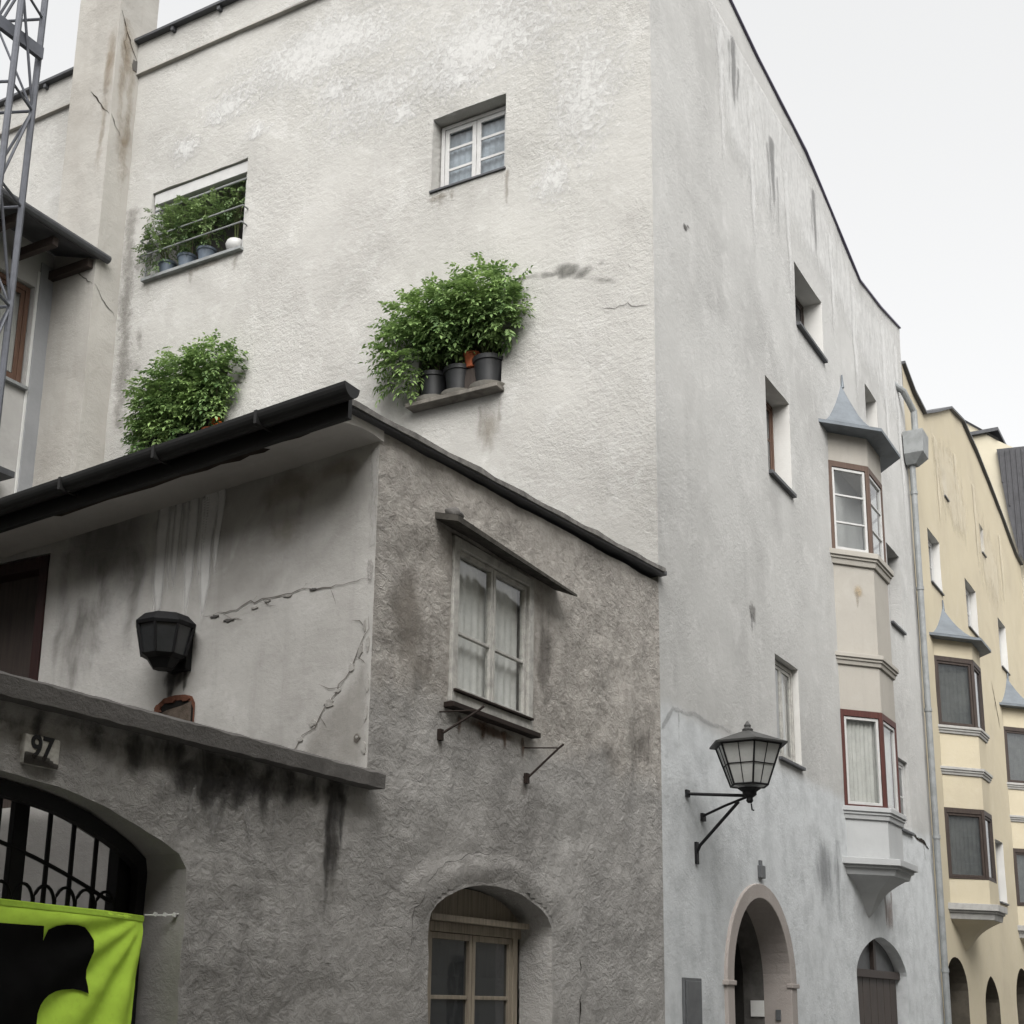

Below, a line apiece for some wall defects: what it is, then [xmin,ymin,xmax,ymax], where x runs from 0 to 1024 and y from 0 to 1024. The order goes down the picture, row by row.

crack [206,578,363,622]
crack [295,616,369,749]
leakage [165,745,346,889]